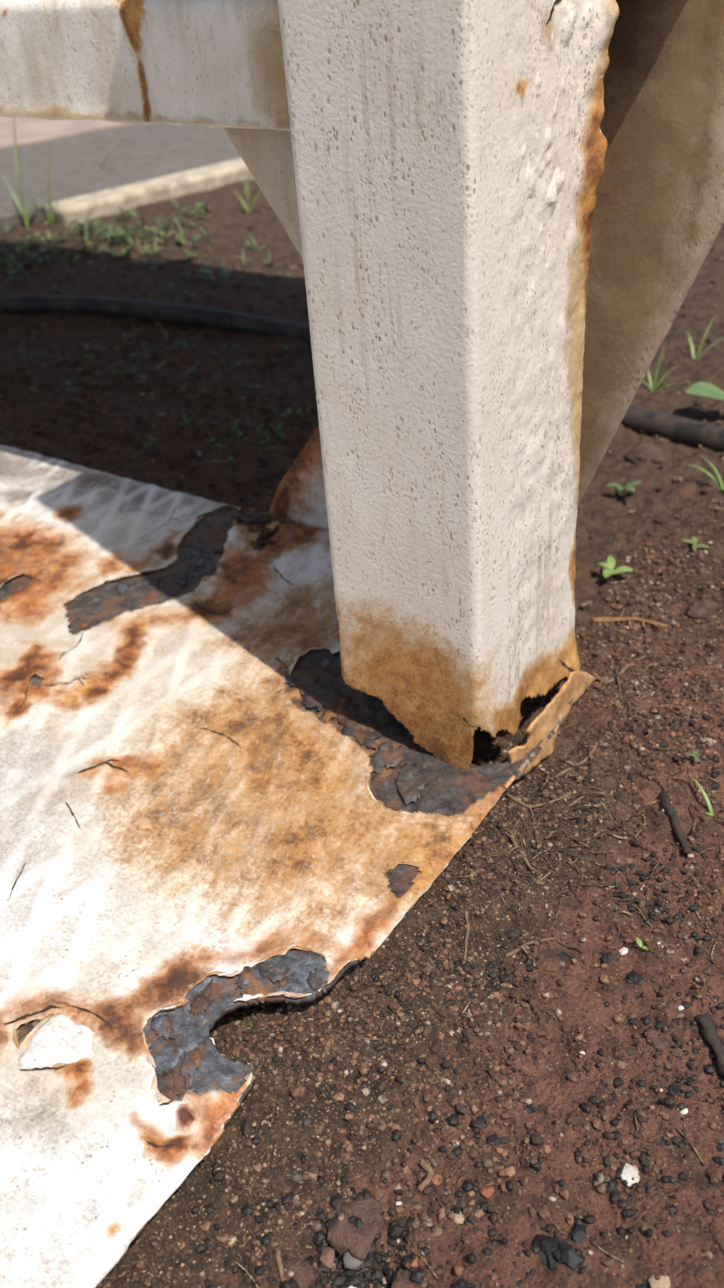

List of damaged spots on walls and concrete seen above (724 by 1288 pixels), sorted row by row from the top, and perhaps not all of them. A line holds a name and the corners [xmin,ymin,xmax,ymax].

rust [0,0,212,125]
crack [544,0,561,24]
rust [565,0,620,503]
rust [0,426,597,1055]
spalling [284,647,587,818]
rust [55,1059,90,1106]